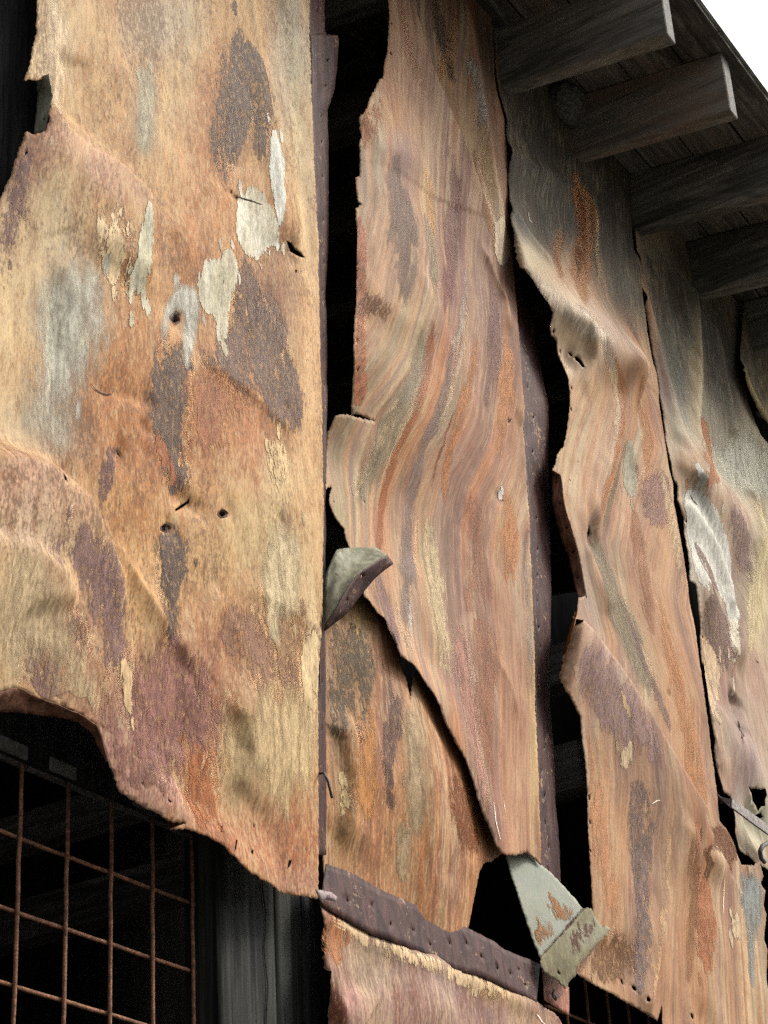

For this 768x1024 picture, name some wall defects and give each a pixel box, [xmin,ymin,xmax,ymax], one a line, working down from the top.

rust [209,28,277,191]
peeling [97,200,154,328]
rust [146,257,306,495]
peeling [197,112,286,357]
rust [354,217,391,406]
peeling [120,654,134,731]
rust [45,508,232,831]
peeling [338,771,351,817]
rust [328,622,403,820]
rust [535,780,655,994]
peeling [684,463,741,724]
rust [695,543,738,671]